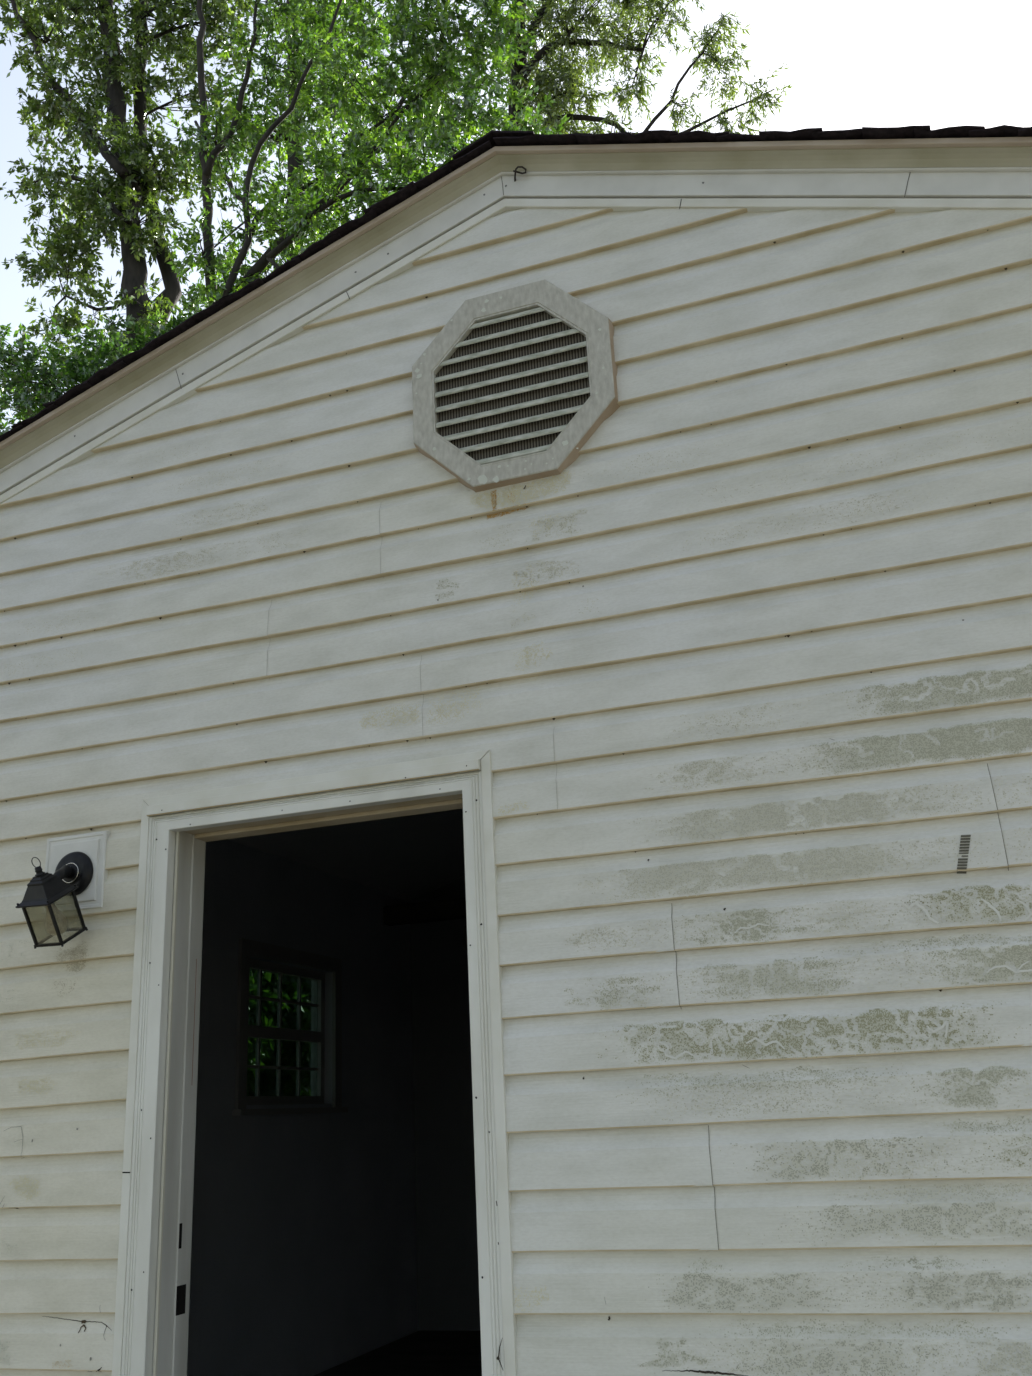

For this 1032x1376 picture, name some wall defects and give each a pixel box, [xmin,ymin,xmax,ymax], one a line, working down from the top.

rust [487,490,528,519]
damp [828,663,1032,719]
damp [645,717,1032,792]
damp [617,776,1032,844]
damp [578,828,1032,905]
crack [664,1368,748,1376]